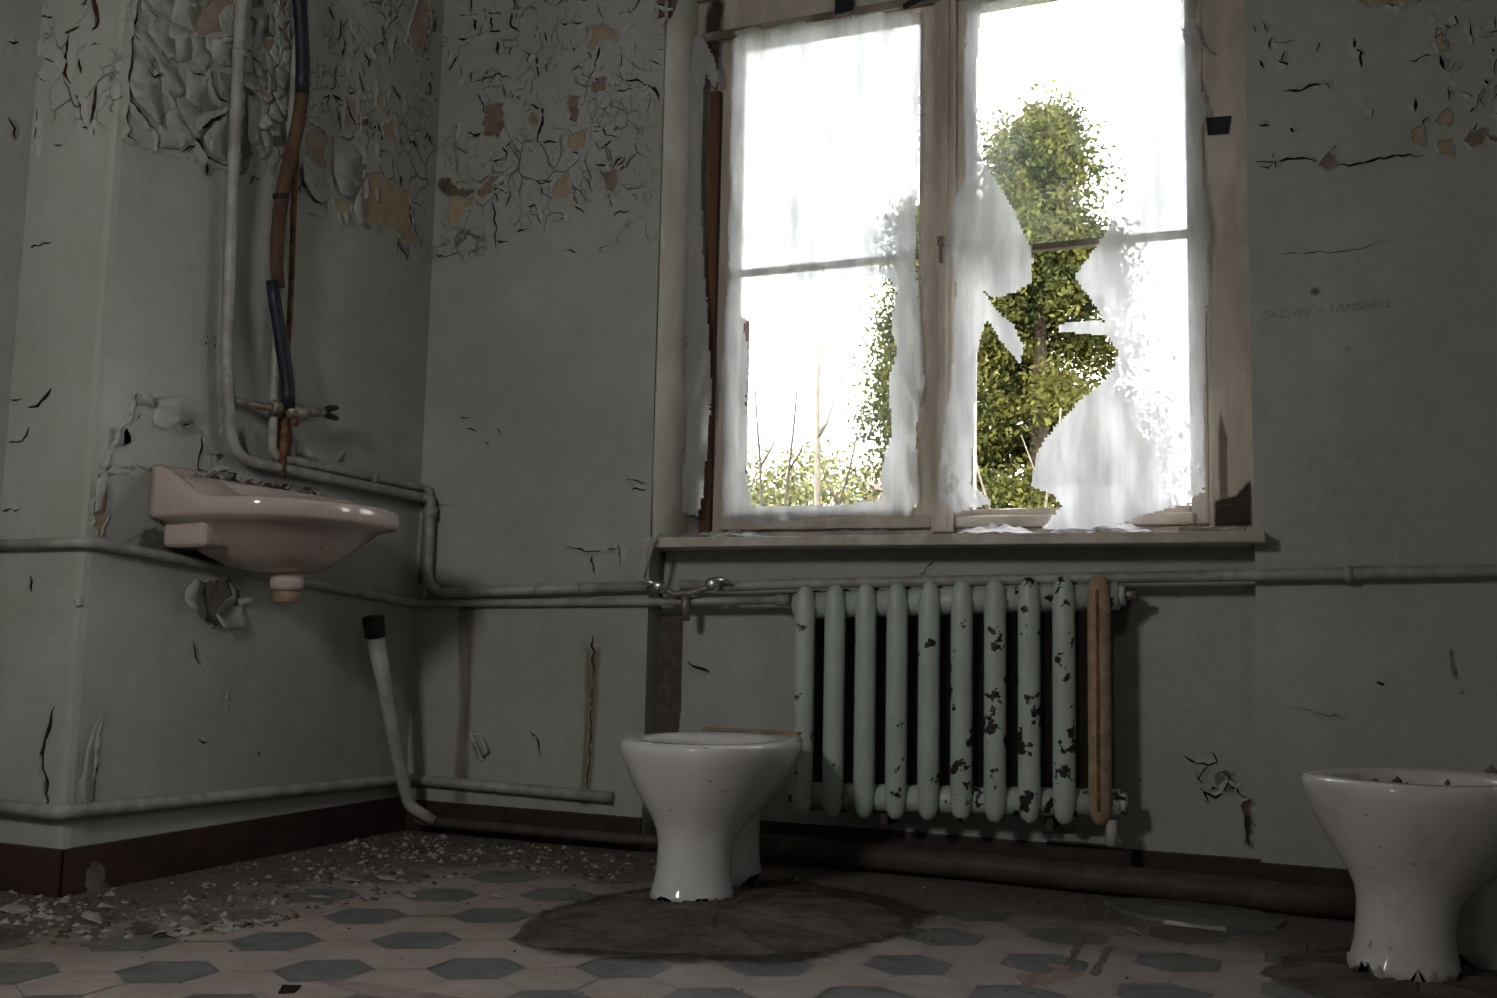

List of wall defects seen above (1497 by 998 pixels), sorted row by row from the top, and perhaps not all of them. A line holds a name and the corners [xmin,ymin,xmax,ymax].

peeling [119,0,309,186]
peeling [437,101,509,250]
peeling [89,389,332,539]
crack [26,575,34,592]
peeling [185,576,258,632]
crack [38,707,103,825]